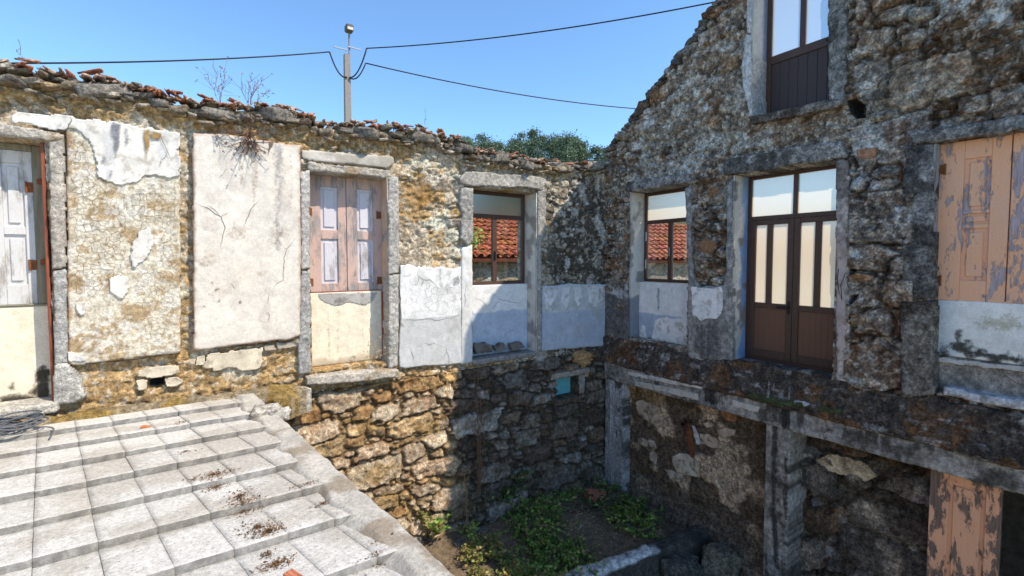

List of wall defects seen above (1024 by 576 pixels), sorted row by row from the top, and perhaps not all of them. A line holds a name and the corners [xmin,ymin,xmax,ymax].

flaking render [12,111,181,185]
flaking render [109,227,153,299]
crack [68,119,299,365]
peeling [318,292,377,306]
flaking render [68,352,86,362]
water stain [940,331,1024,366]